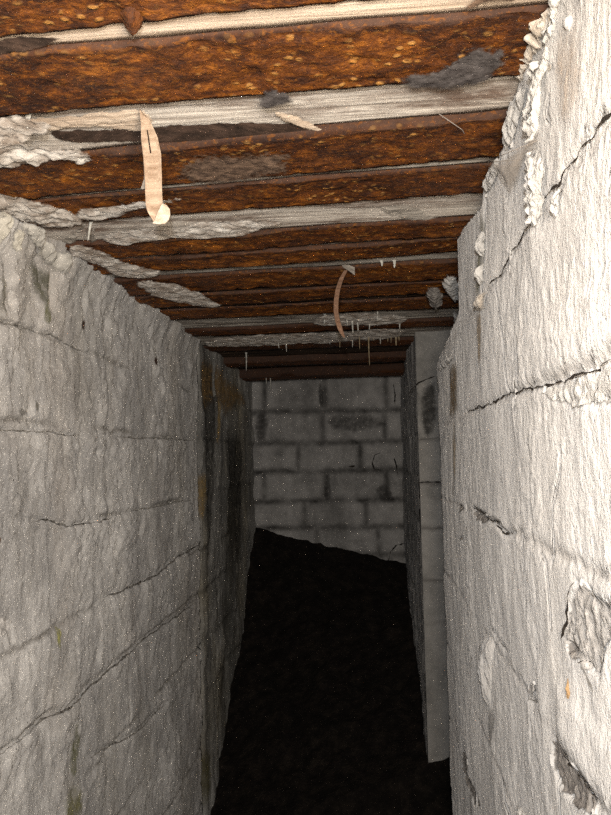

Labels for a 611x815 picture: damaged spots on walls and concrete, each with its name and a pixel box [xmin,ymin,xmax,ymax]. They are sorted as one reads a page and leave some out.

peeling [30,109,153,131]
crack [544,112,611,208]
crack [468,226,611,412]
water stain [423,386,435,434]
crack [471,505,510,535]
crack [103,545,199,598]
spalling [561,579,611,692]
flaking render [550,735,601,815]